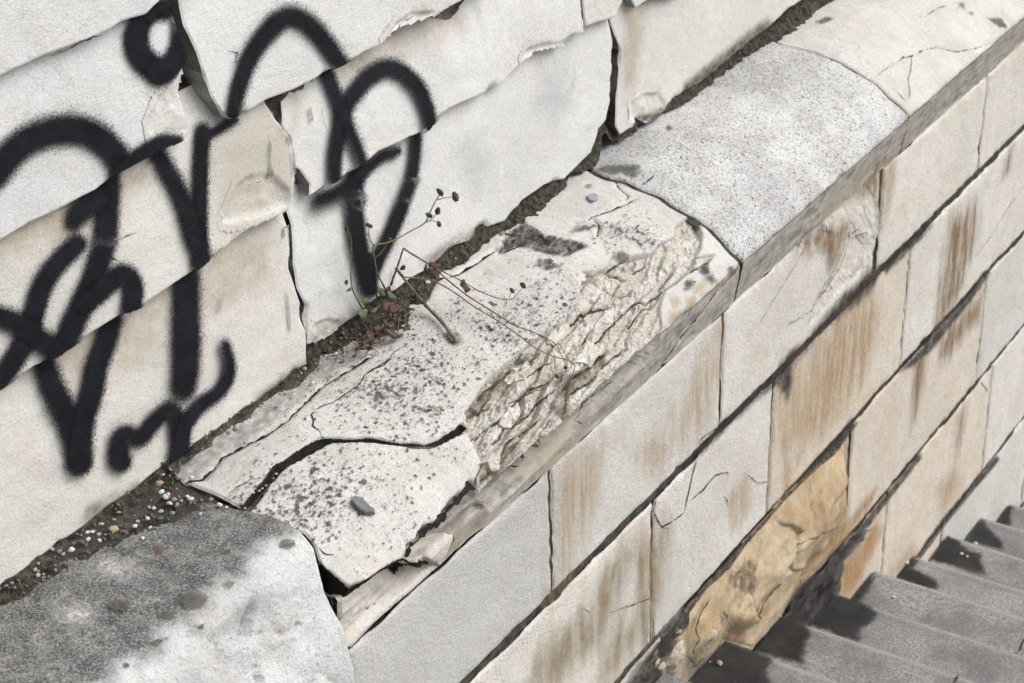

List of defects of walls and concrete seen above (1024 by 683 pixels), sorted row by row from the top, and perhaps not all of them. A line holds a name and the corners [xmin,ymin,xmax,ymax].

crack [868,44,988,100]
crack [181,260,737,655]
spalling [456,220,713,494]
crack [653,424,768,556]